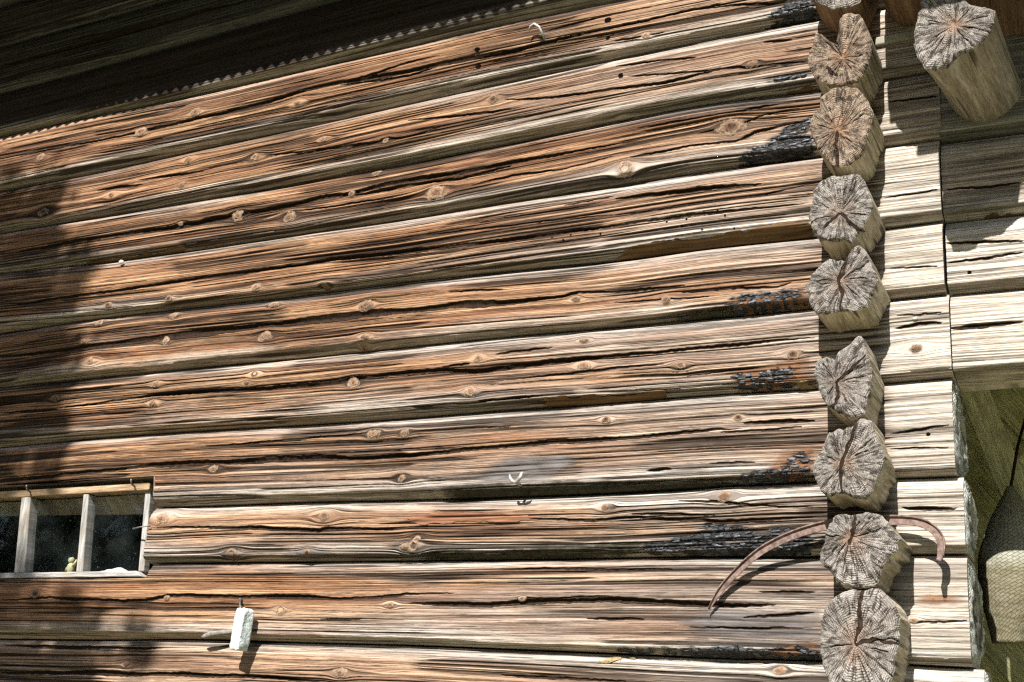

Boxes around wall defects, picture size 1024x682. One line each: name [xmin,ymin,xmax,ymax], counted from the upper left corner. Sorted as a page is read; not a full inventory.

crack [0,0,838,158]
crack [832,130,840,168]
crack [823,212,865,232]
crack [837,257,848,309]
crack [0,337,865,480]
crack [839,422,857,544]
crack [7,567,815,630]
crack [854,590,900,646]